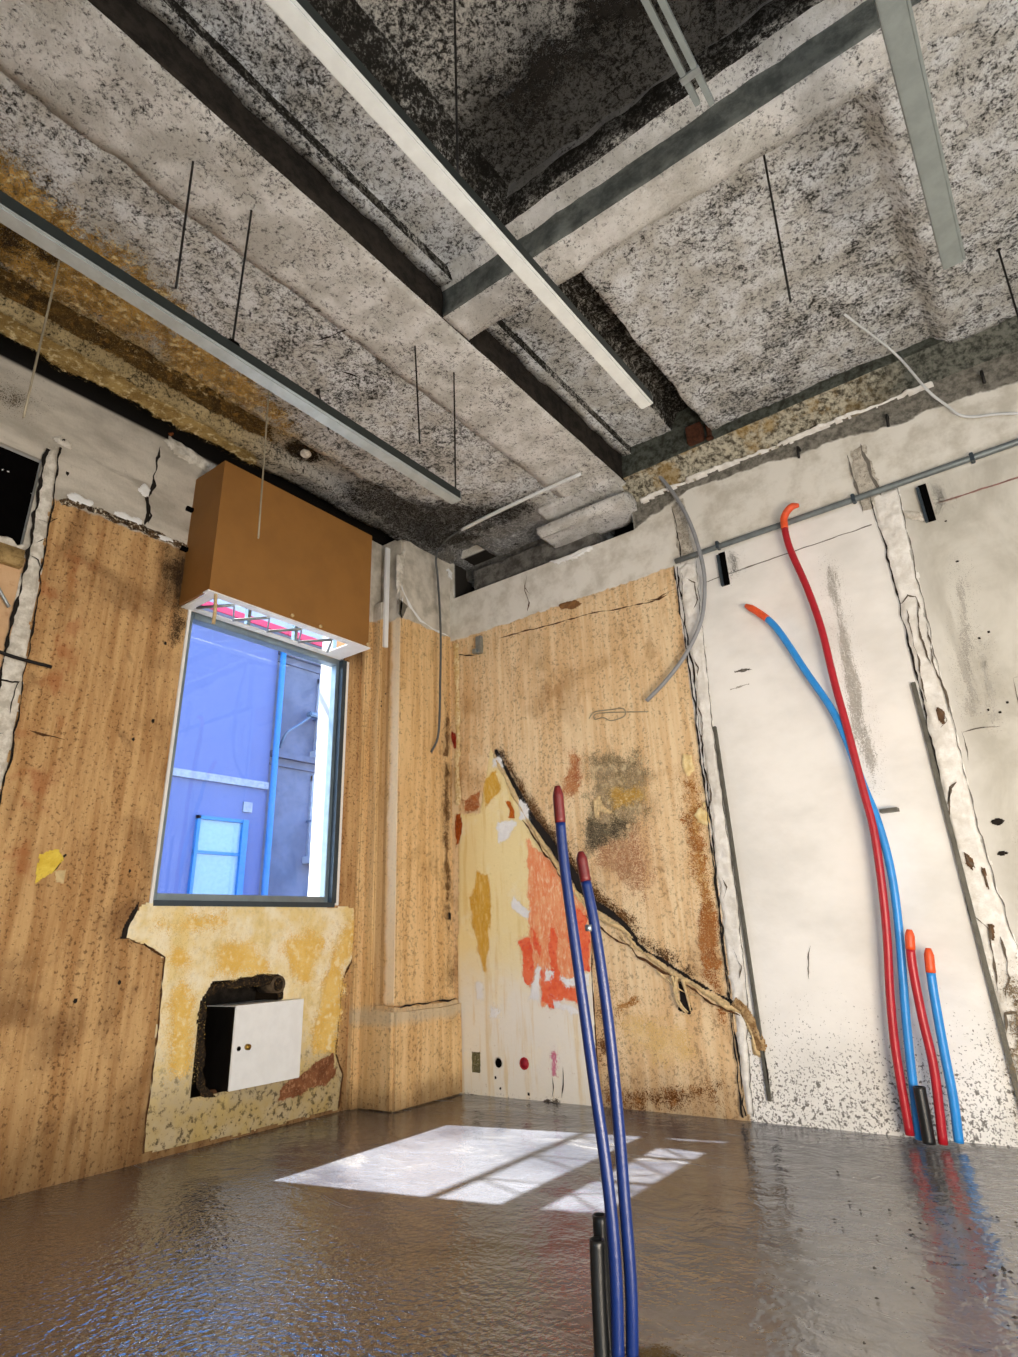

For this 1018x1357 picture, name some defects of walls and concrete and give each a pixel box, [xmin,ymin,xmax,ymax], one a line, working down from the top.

water stain [422,0,720,178]
water stain [0,89,207,318]
water stain [0,223,562,562]
flaking render [0,435,188,804]
peeling [35,849,67,884]
flaking render [120,902,156,950]
peeling [496,797,530,844]
peeling [511,897,530,920]
flaking render [194,973,284,1098]
peeling [525,963,592,1015]